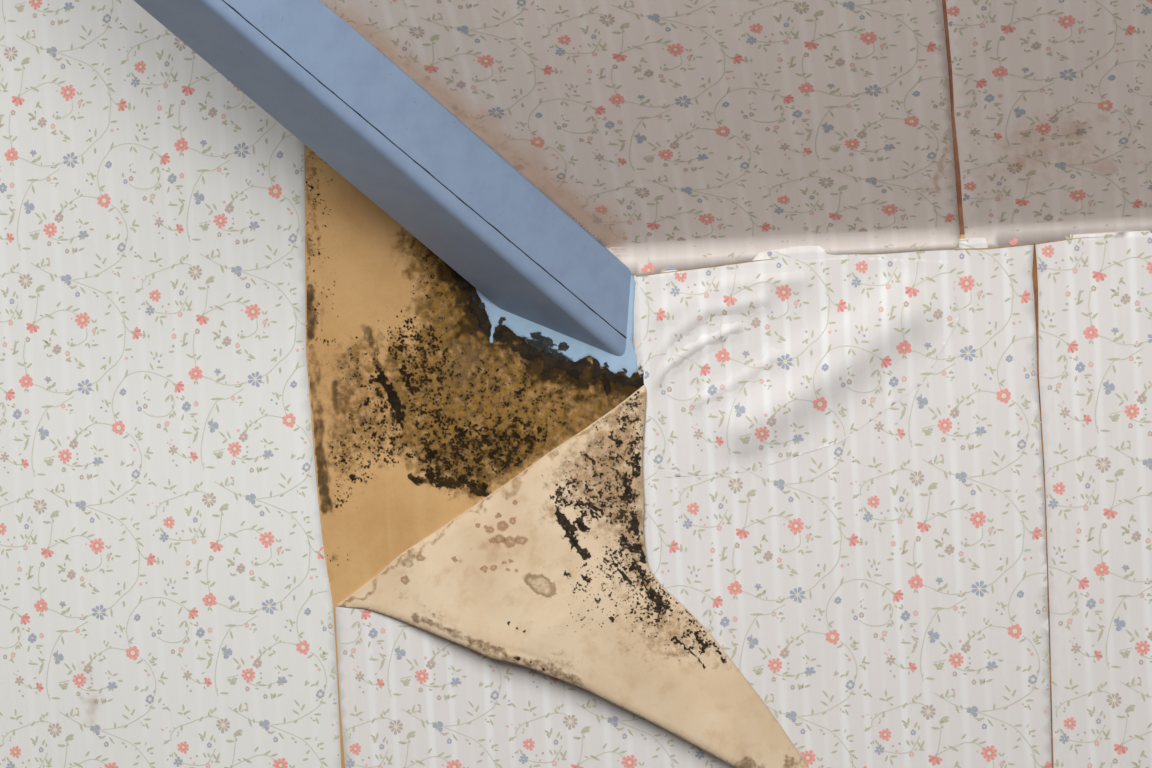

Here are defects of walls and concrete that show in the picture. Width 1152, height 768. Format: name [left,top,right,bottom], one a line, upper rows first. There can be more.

peeling [305,145,626,610]
damp [306,155,727,668]
damp [447,628,575,683]